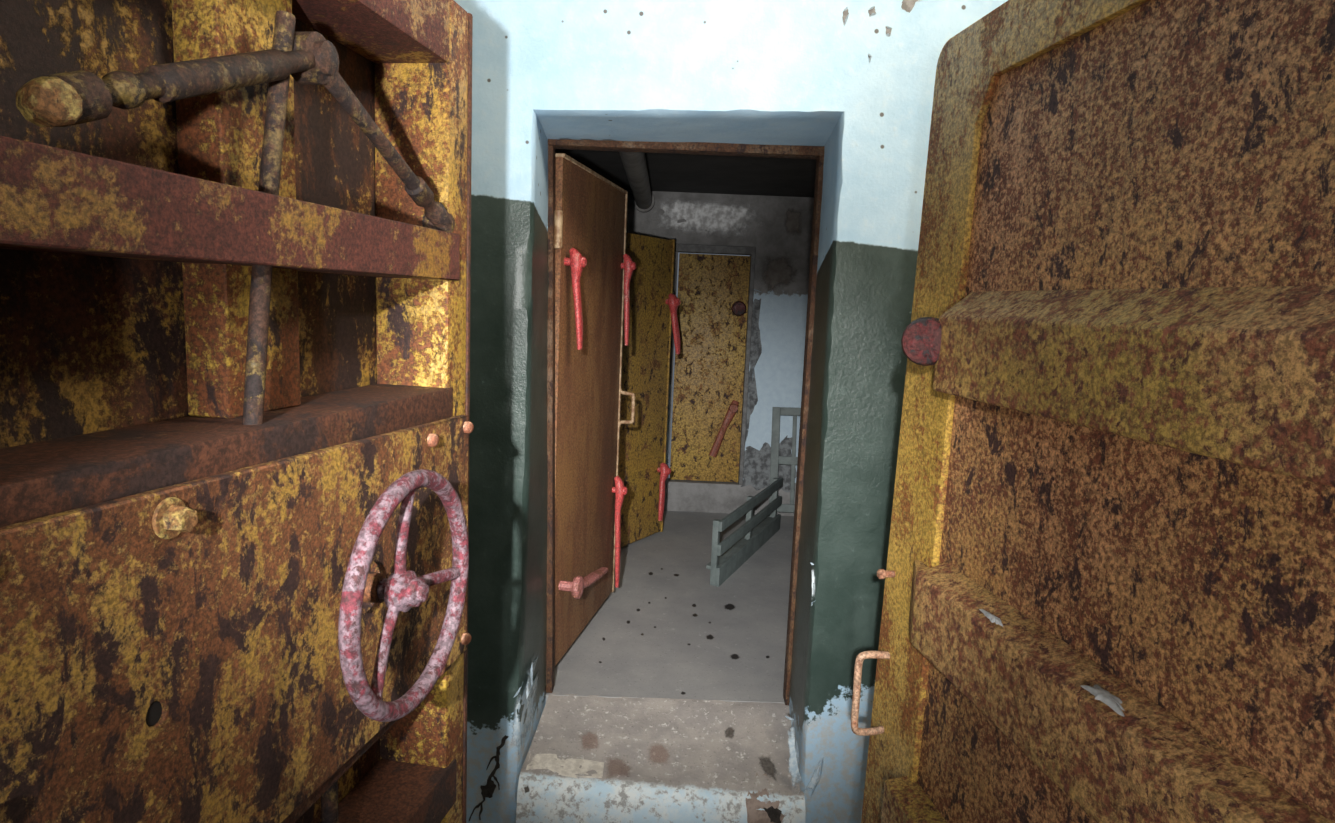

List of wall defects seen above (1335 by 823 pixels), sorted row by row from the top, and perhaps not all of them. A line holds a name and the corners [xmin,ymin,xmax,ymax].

peeling [868,5,892,37]
peeling [901,0,921,13]
crack [469,735,508,821]
spalling [746,716,824,823]